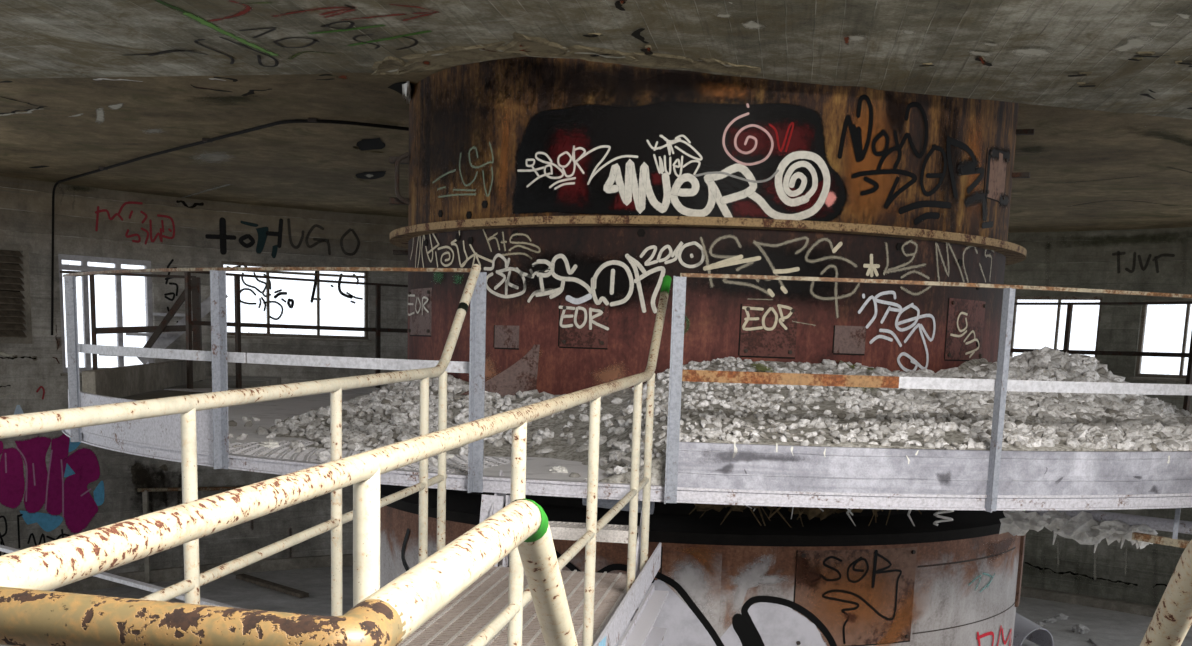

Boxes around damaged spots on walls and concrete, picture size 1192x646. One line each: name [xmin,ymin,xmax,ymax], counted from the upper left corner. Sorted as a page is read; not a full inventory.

spalling [1114,14,1189,61]
crack [0,97,47,116]
rust [867,131,890,196]
crack [0,352,60,397]
rust [597,366,621,383]
rust [824,572,882,619]
crack [1024,562,1167,588]